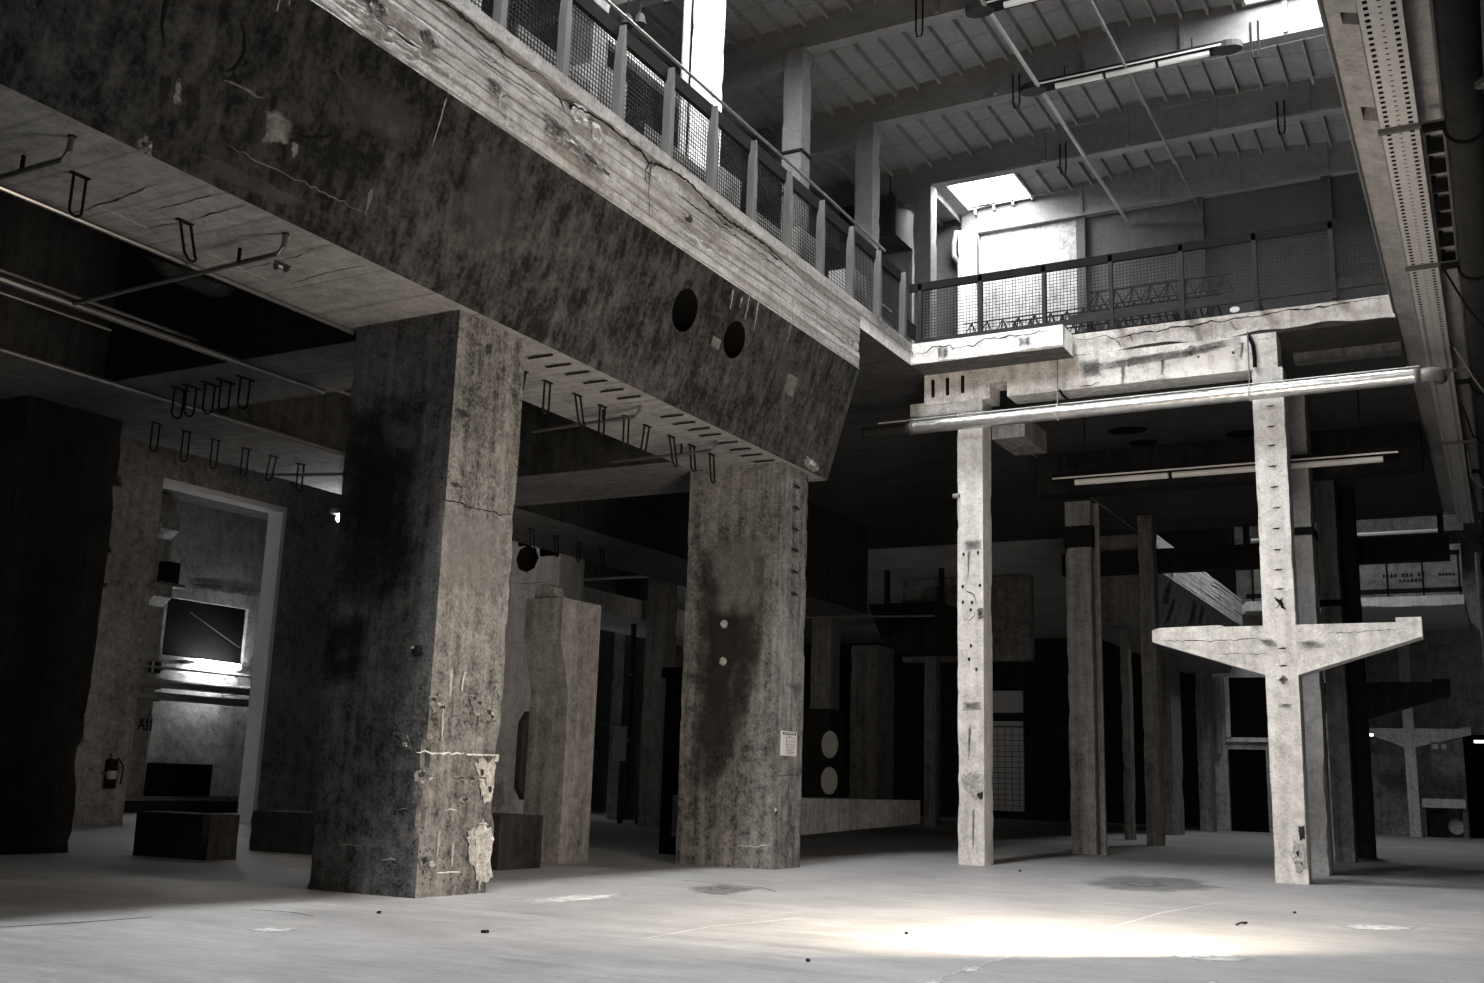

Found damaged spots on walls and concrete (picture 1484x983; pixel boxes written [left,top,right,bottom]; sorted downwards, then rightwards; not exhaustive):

spalling [369,0,390,21]
spalling [420,25,441,51]
spalling [414,766,435,784]
spalling [452,757,496,804]
spalling [467,822,494,889]